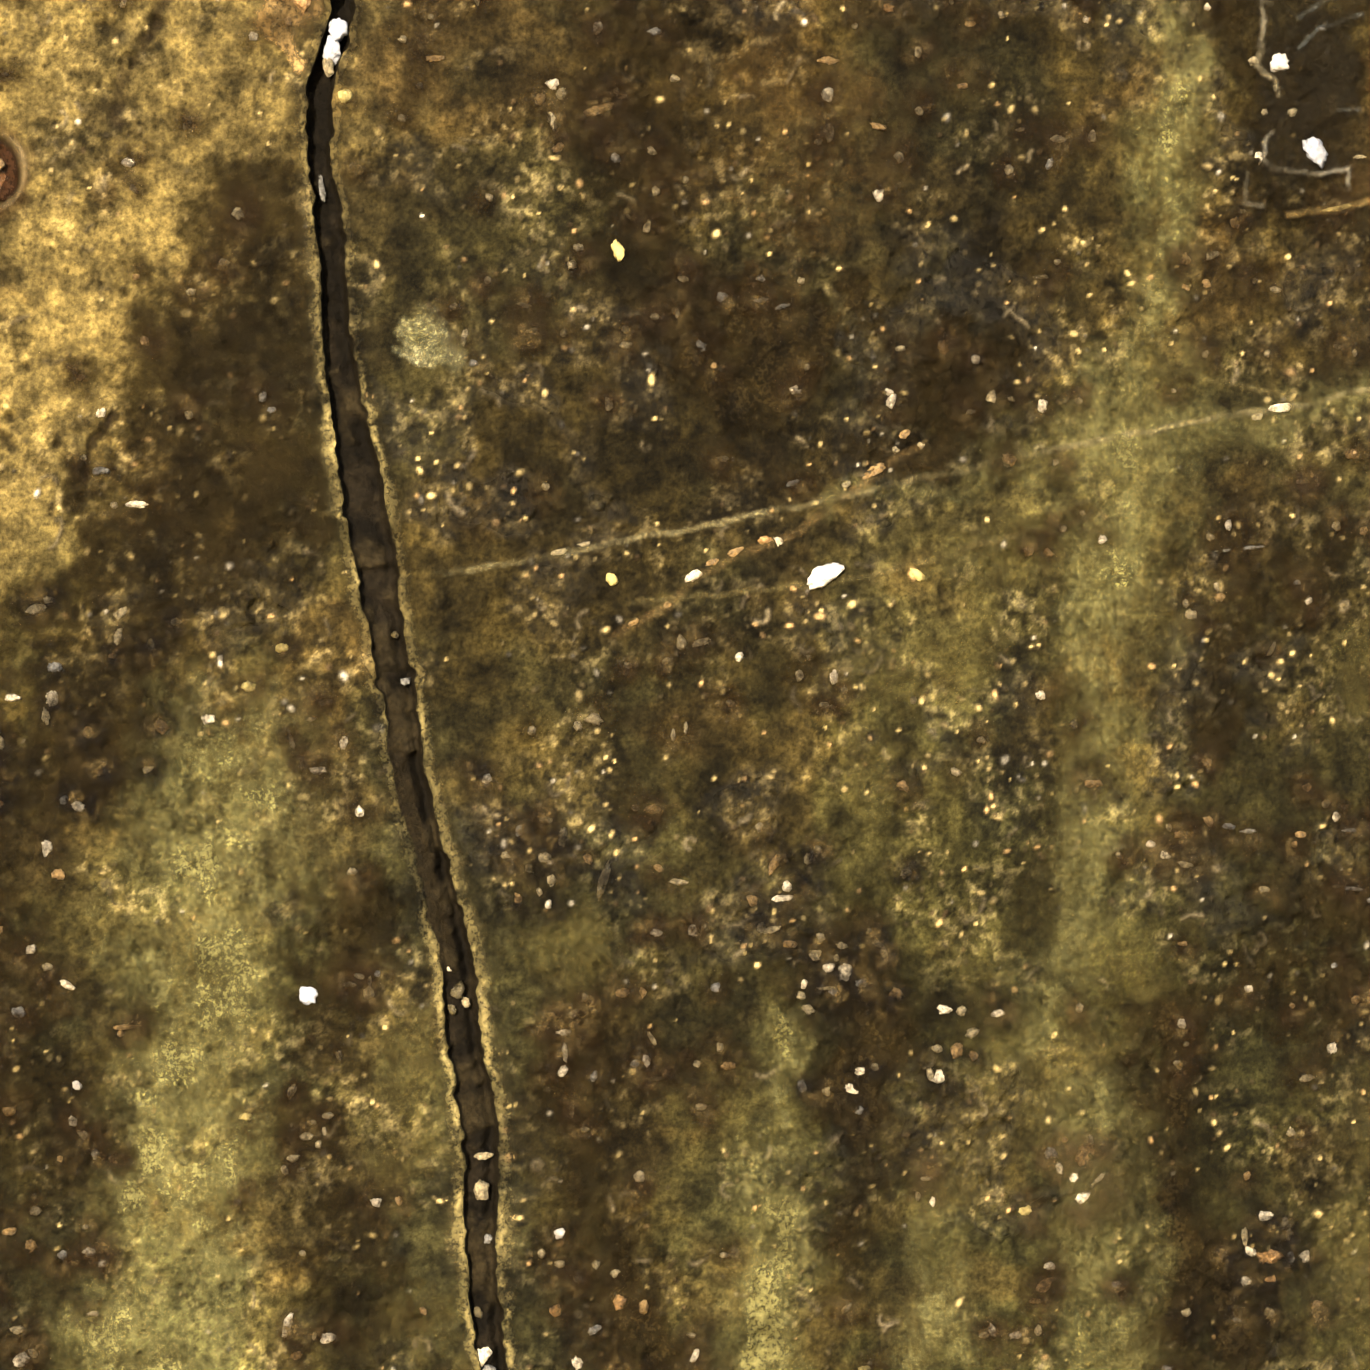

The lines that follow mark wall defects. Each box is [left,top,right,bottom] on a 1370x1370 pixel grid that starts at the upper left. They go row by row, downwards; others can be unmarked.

damp [1133,9,1210,254]
crack [551,541,593,556]
crack [627,429,925,626]
crack [1055,417,1211,450]
damp [1126,278,1177,362]
crack [1248,403,1293,421]
crack [1329,387,1368,400]
damp [0,136,418,1370]
crack [293,0,521,1370]
damp [1026,390,1356,916]
damp [1026,834,1370,1370]